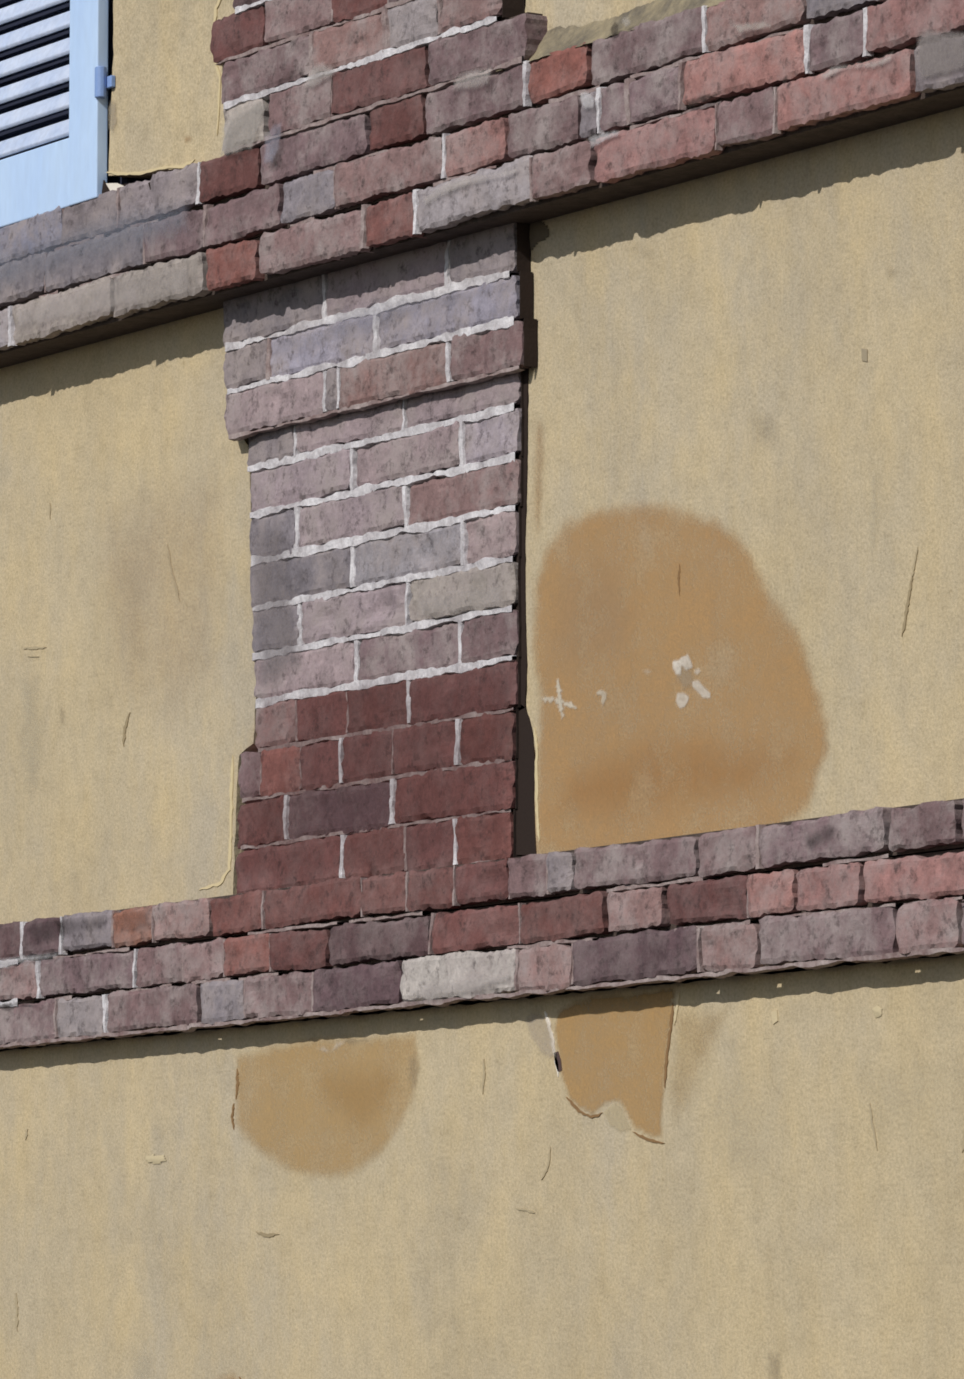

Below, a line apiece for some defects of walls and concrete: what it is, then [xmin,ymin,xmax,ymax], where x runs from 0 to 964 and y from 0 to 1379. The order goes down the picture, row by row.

damp [537,513,824,851]
damp [239,1041,412,1169]
peeling [544,990,680,1144]